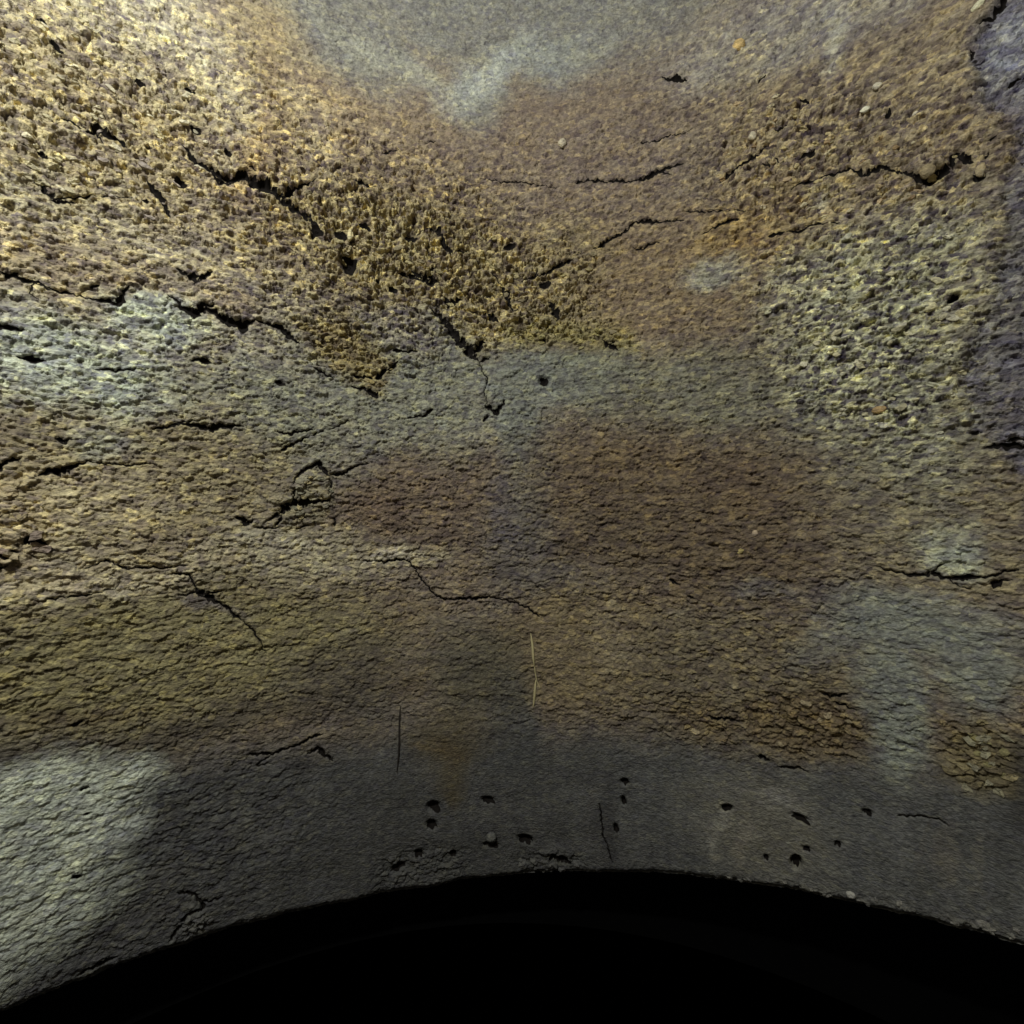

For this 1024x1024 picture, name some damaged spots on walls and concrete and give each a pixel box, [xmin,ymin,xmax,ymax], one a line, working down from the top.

crack [182,145,319,240]
crack [484,163,684,188]
crack [720,125,997,190]
crack [0,271,129,307]
crack [167,268,299,343]
crack [376,209,746,422]
crack [236,420,369,530]
crack [40,559,266,651]
crack [364,558,540,617]
crack [881,564,1019,590]
spalling [365,801,472,897]
spalling [484,835,606,874]